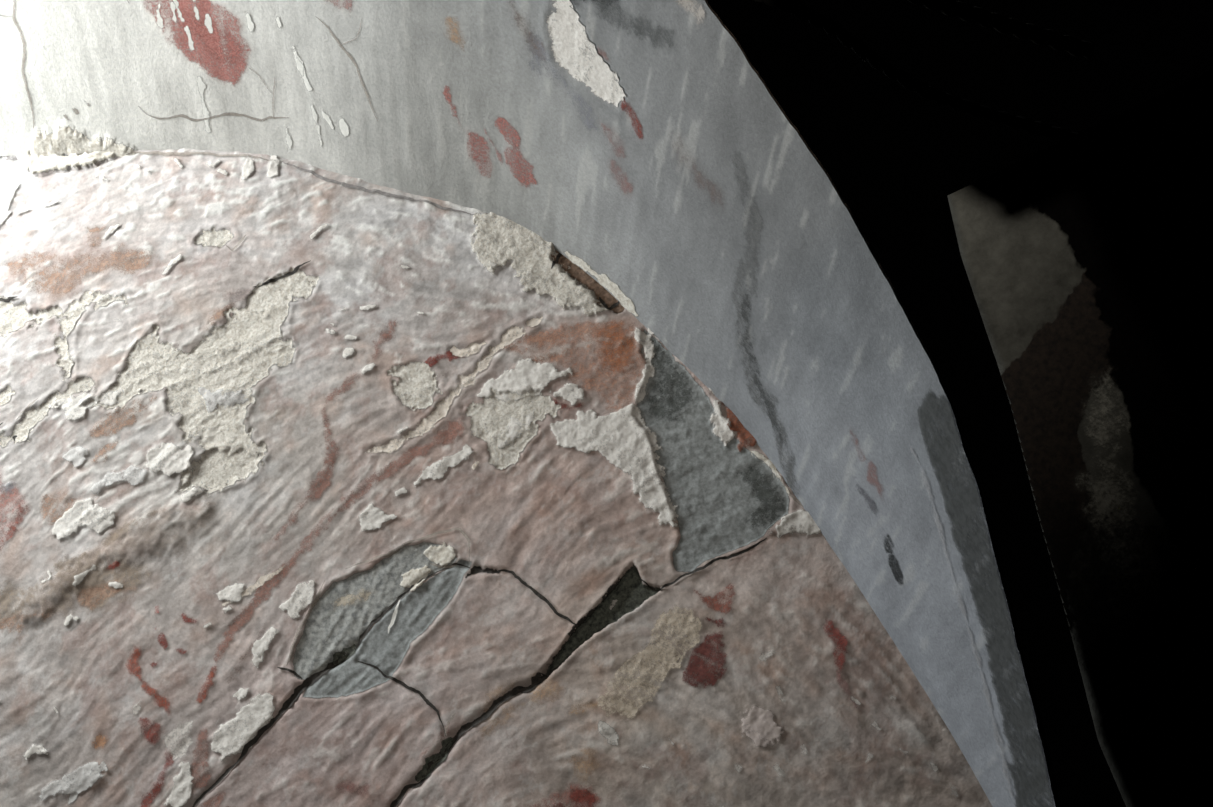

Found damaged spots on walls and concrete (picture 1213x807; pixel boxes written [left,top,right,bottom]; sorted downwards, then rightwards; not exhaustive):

crack [0,0,34,161]
spalling [24,103,135,174]
crack [318,18,378,121]
peeling [547,0,643,139]
spalling [0,260,319,540]
peeling [162,254,181,275]
peeling [326,304,376,358]
peeling [359,503,397,531]
spalling [361,212,679,527]
peeling [709,388,826,540]
crack [193,527,767,807]